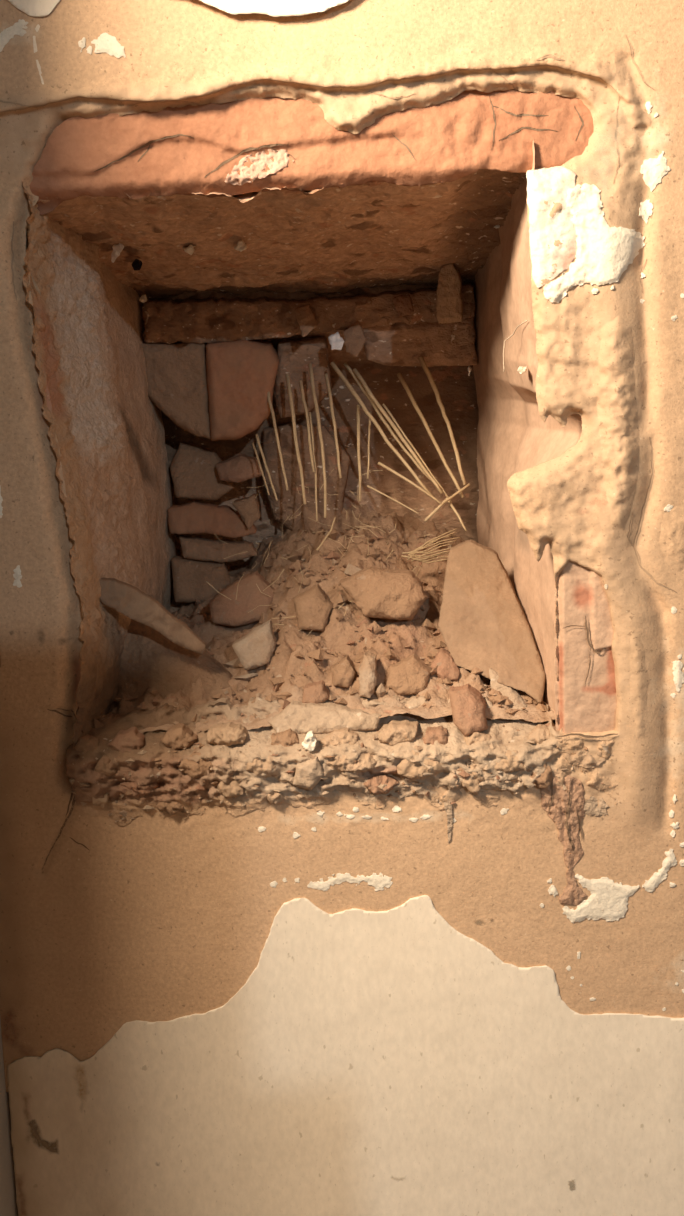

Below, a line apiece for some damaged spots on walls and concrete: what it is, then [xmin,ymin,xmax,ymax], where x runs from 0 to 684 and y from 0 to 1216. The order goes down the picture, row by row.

crack [0,35,655,184]
peeling [639,199,653,224]
spalling [23,89,618,827]
spalling [443,799,453,842]
spalling [540,774,591,905]